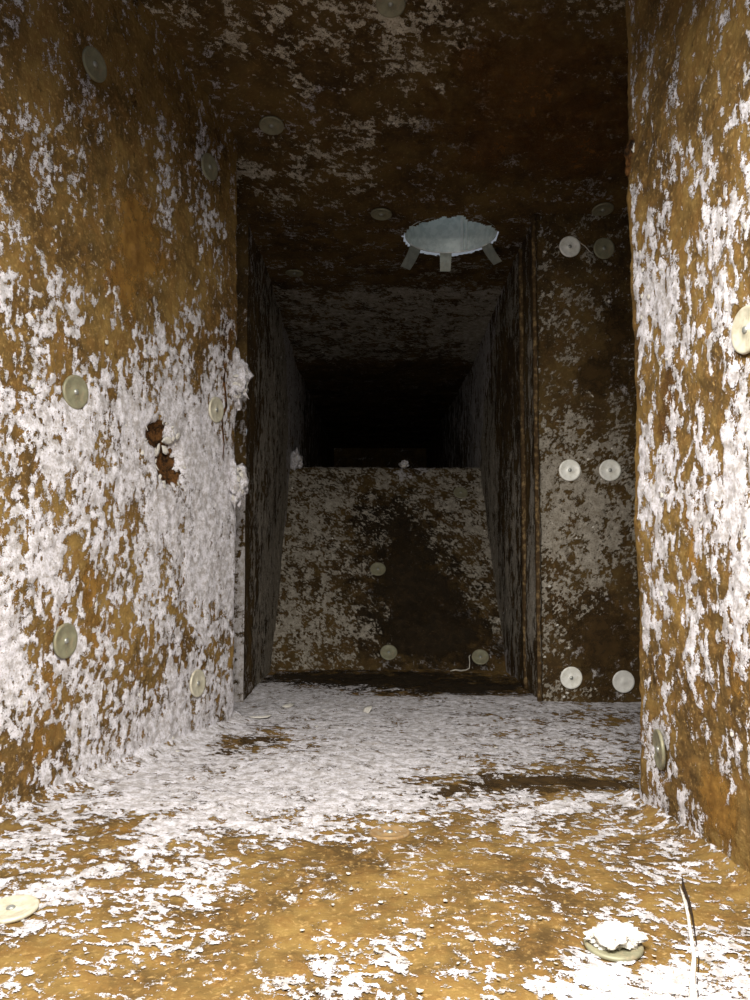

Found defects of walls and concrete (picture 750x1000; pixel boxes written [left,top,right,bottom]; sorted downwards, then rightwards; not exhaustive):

damp [0,0,198,326]
damp [629,0,685,205]
damp [684,510,702,582]
damp [30,604,67,765]
damp [82,552,108,675]
damp [724,607,747,696]
damp [98,825,139,833]
damp [215,737,284,756]
damp [405,704,750,859]